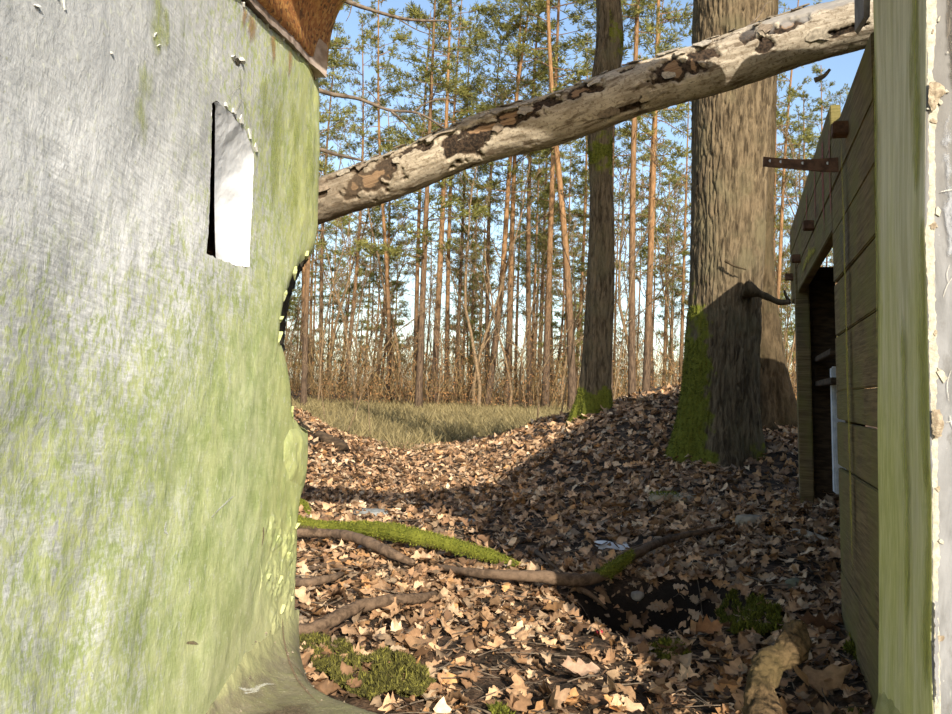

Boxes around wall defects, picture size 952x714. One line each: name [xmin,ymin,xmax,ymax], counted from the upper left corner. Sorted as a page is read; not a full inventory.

spalling [224,102,258,152]
damp [944,192,952,255]
peeling [925,0,949,714]